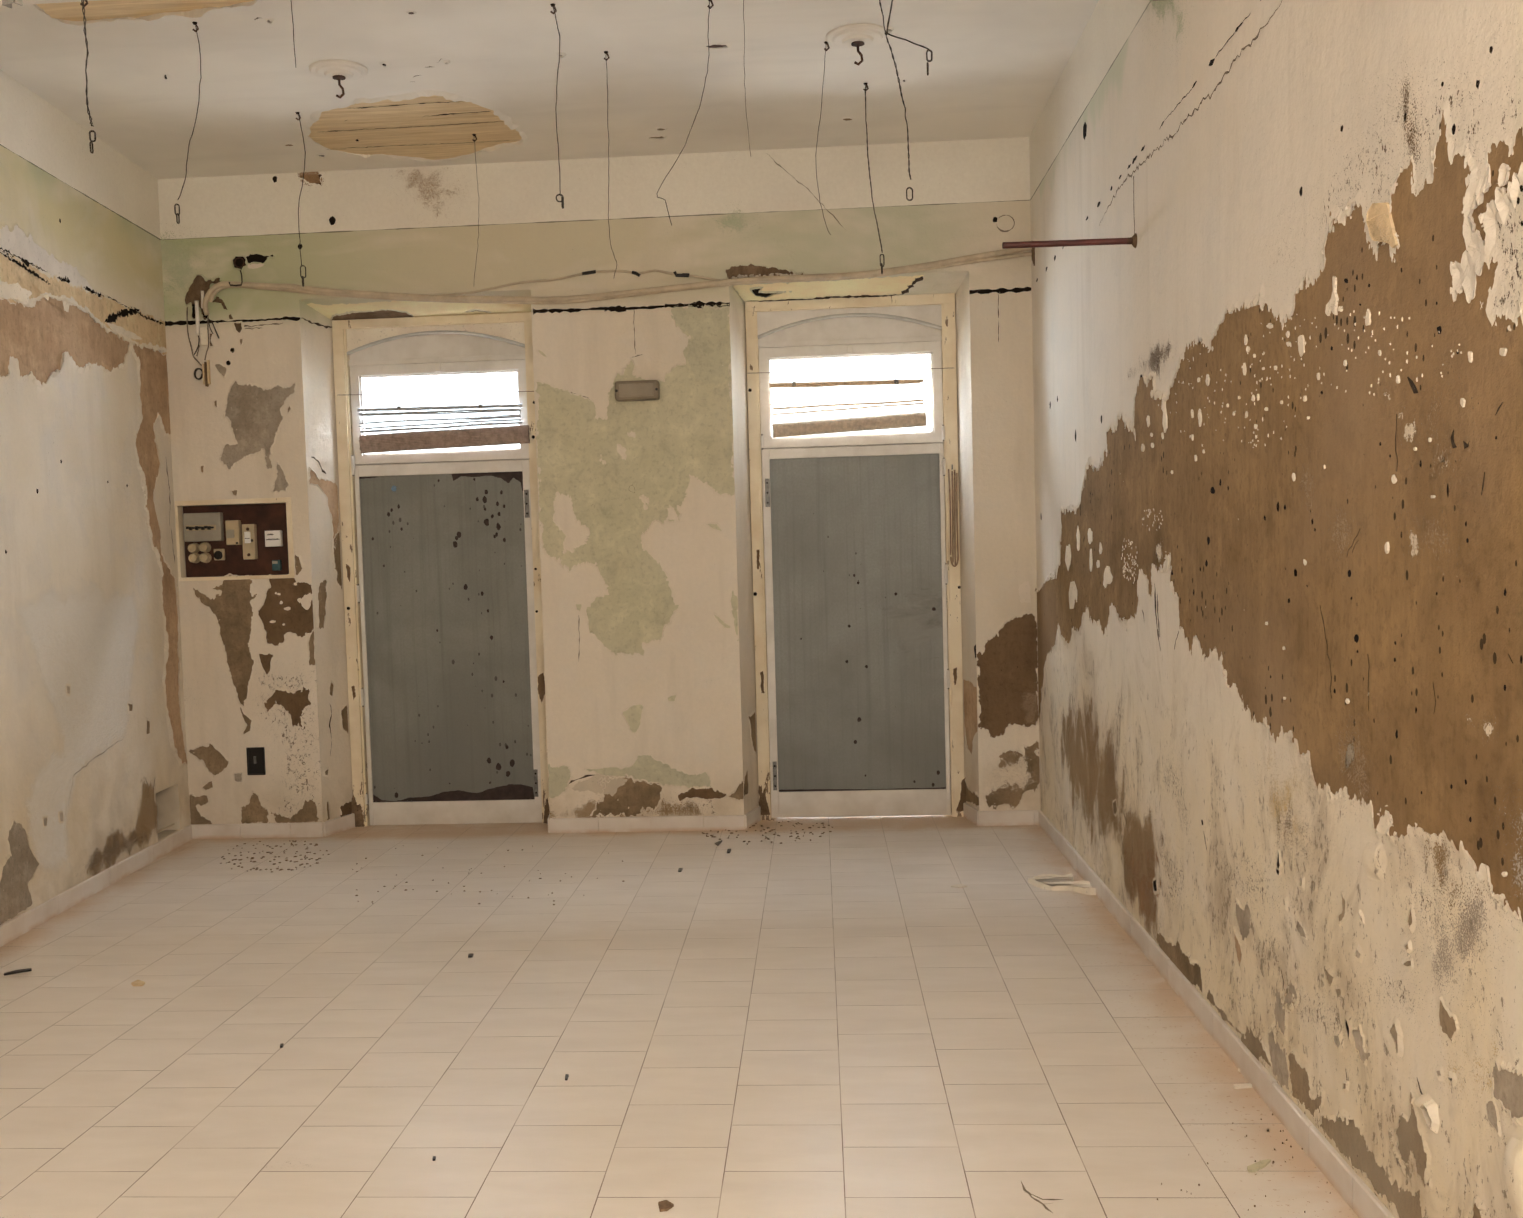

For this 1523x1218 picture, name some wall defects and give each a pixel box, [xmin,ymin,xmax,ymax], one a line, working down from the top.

spalling [33,0,274,26]
spalling [302,90,527,162]
crack [1100,1,1282,223]
peeling [184,251,924,497]
peeling [0,222,352,825]
peeling [963,99,1523,928]
spalling [590,709,757,818]
leakage [1060,687,1190,932]
leakage [1221,748,1317,964]
peeling [1276,847,1307,940]
leakage [1355,835,1505,1028]